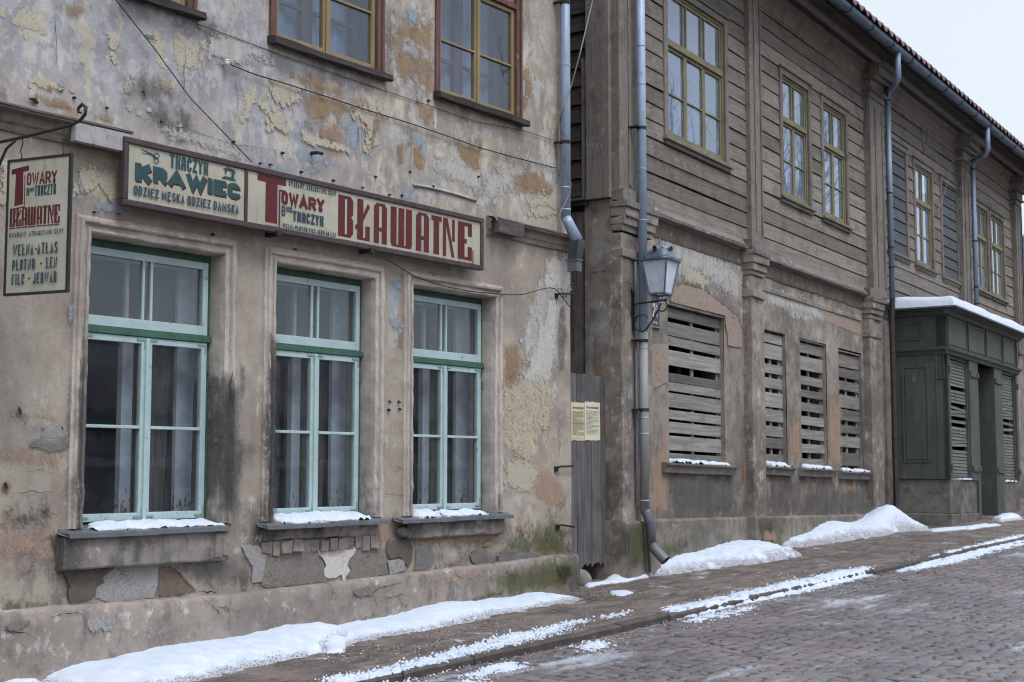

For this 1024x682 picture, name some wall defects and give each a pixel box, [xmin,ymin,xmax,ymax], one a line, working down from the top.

peeling [146,30,390,174]
peeling [393,9,561,218]
damp [220,368,252,515]
peeling [502,299,566,516]
spalling [62,567,115,604]
spalling [159,567,196,597]
peeling [240,524,541,597]